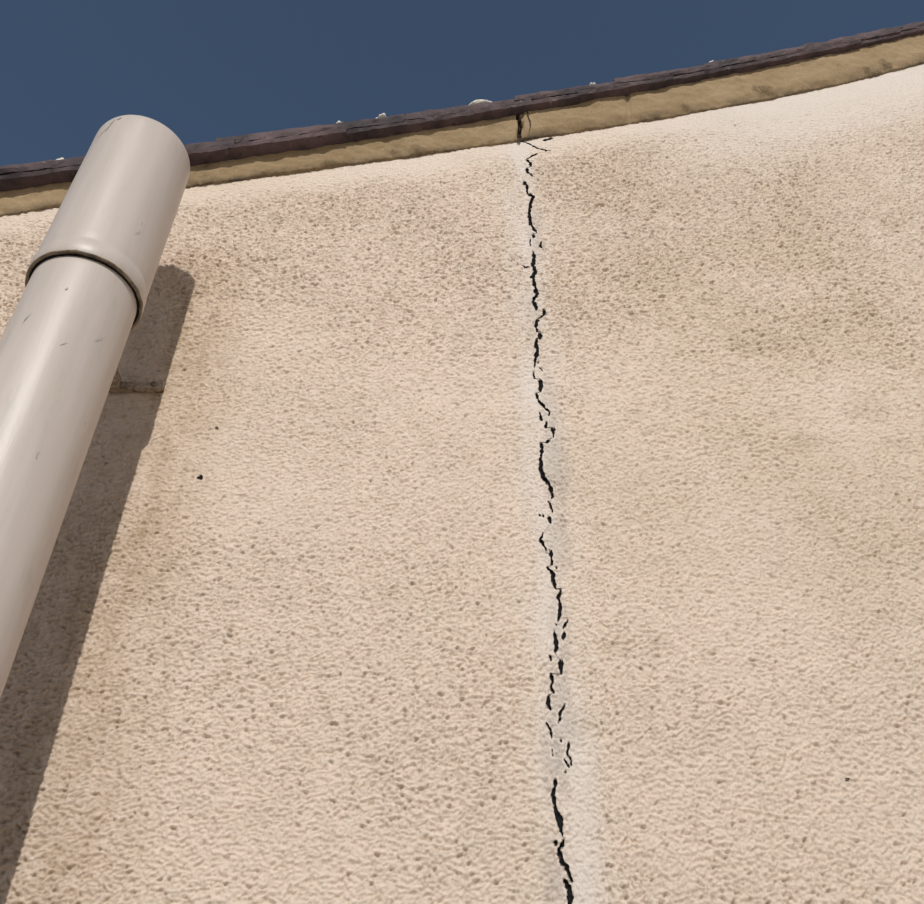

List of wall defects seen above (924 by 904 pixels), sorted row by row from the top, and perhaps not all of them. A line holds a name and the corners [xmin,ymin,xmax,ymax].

crack [517,111,574,904]